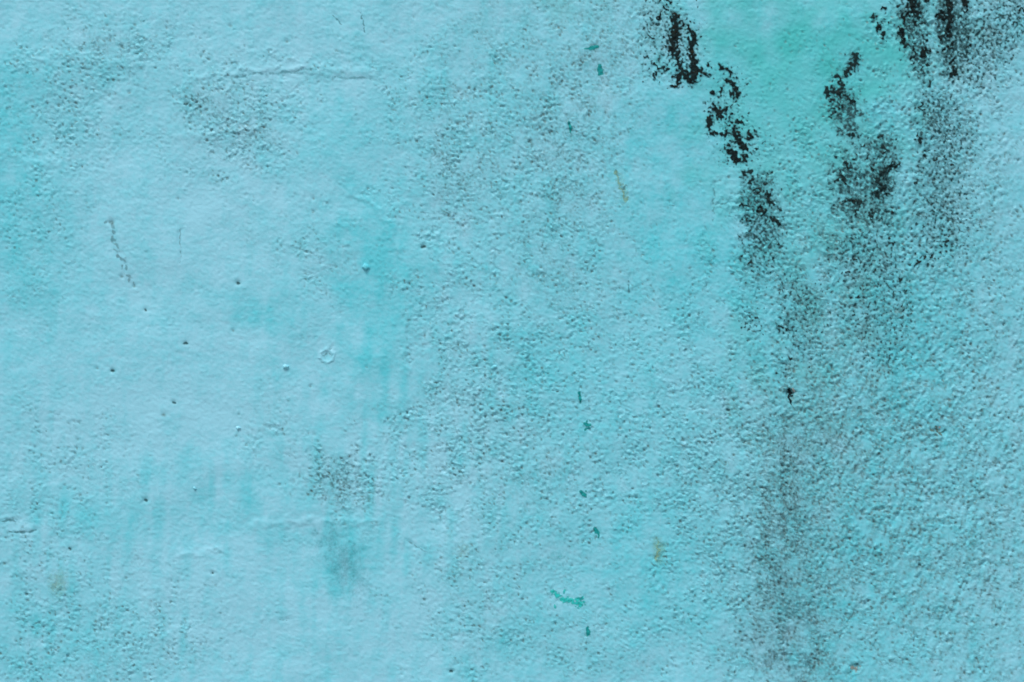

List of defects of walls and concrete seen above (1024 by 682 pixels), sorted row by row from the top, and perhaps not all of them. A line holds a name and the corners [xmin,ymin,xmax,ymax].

damp [640,0,1024,377]